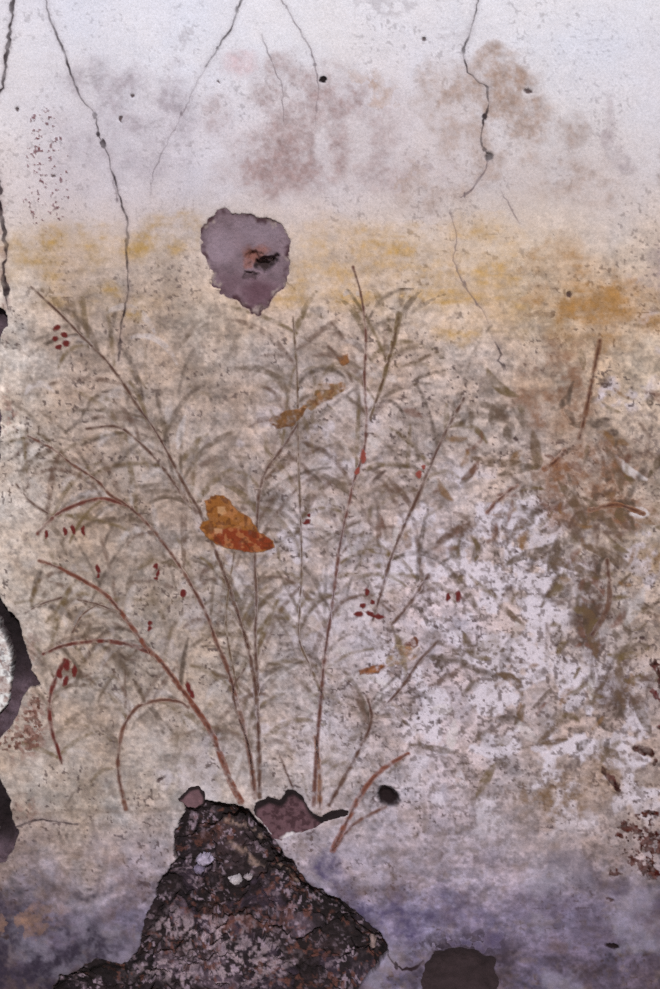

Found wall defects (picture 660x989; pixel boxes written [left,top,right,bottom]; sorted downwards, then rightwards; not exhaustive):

crack [0,0,16,94]
crack [149,0,243,196]
crack [280,0,319,129]
crack [45,0,130,362]
crack [448,0,520,371]
crack [0,178,11,336]
spalling [200,208,291,316]
crack [0,598,40,737]
peeling [0,695,44,751]
crack [0,780,79,863]
spalling [54,786,388,989]
spalling [421,947,499,989]